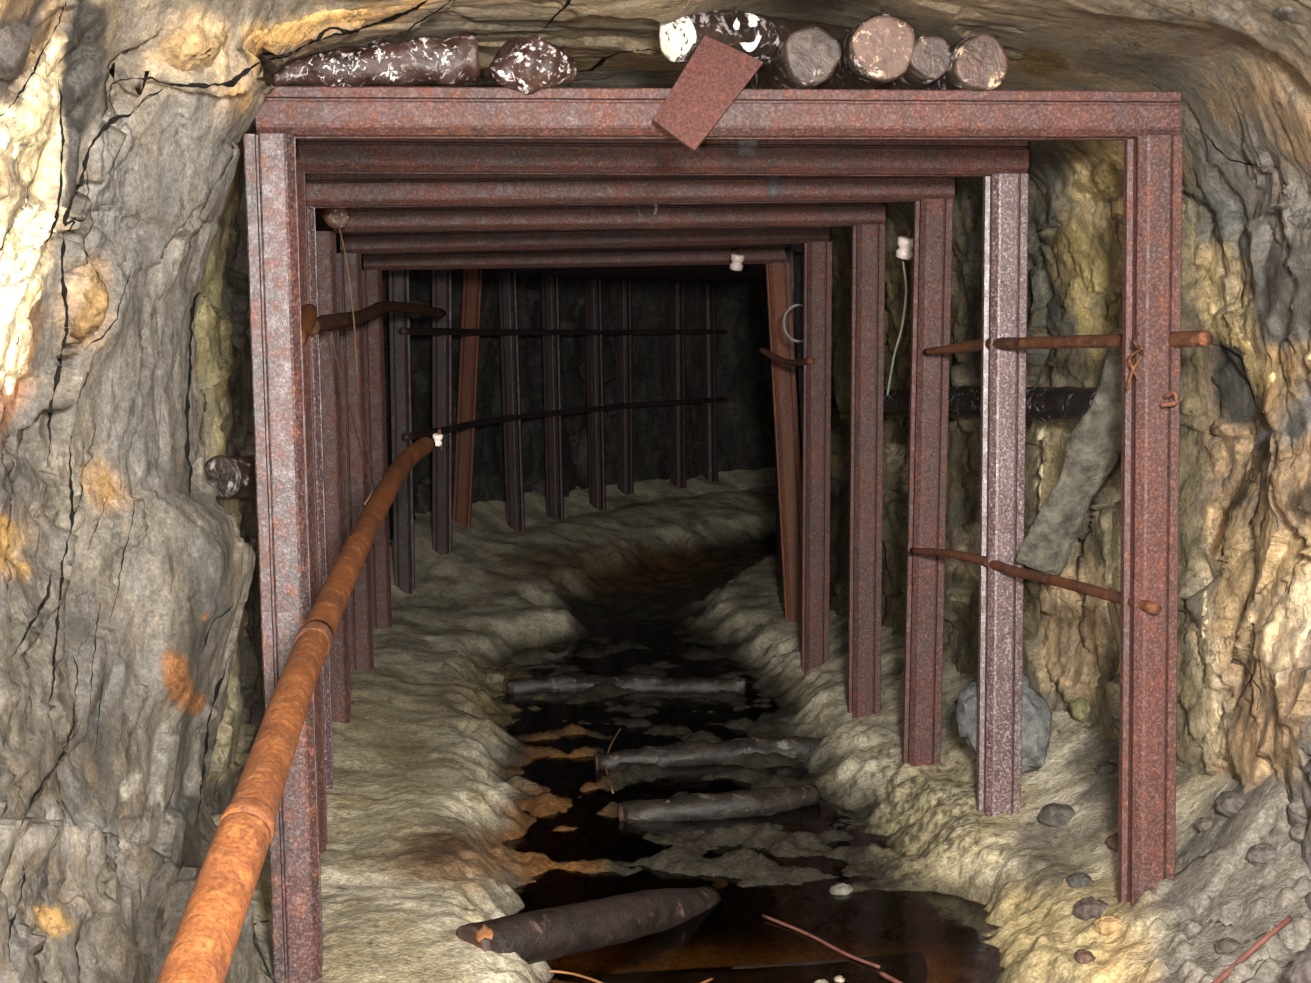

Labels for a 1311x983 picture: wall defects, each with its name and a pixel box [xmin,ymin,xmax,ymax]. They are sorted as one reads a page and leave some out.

corrosion [164,651,206,714]